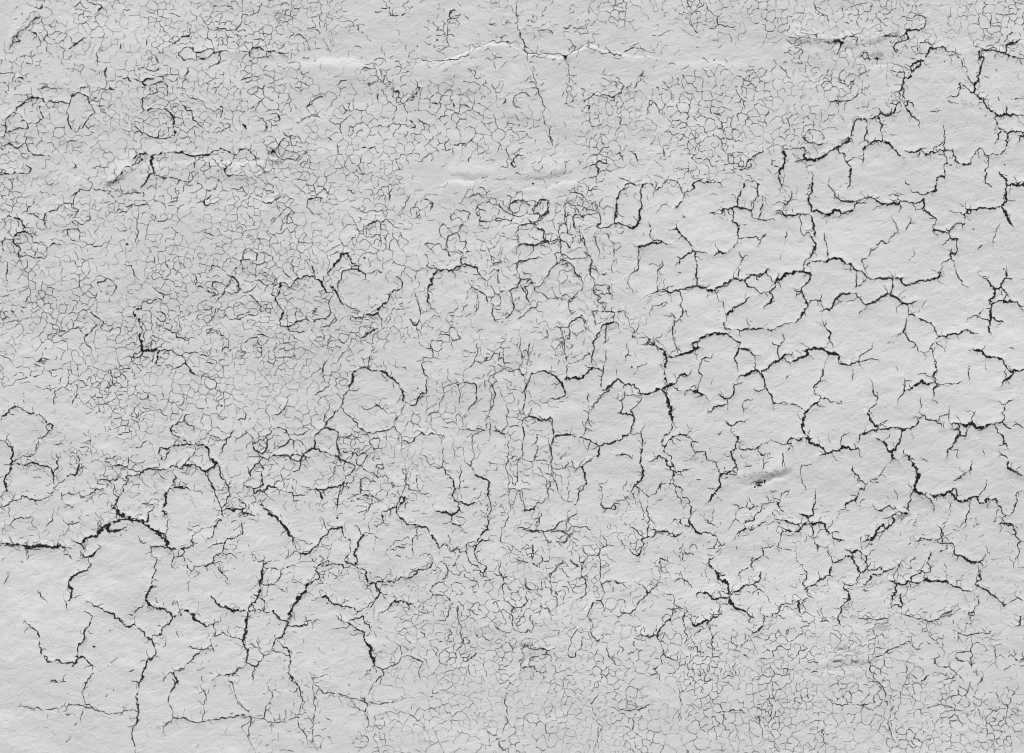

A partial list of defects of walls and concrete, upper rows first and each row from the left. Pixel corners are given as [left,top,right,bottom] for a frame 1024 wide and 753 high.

crack [375,0,423,34]
crack [425,9,469,54]
crack [622,222,667,295]
crack [967,267,1022,333]
crack [969,347,1024,386]
crack [999,452,1022,476]